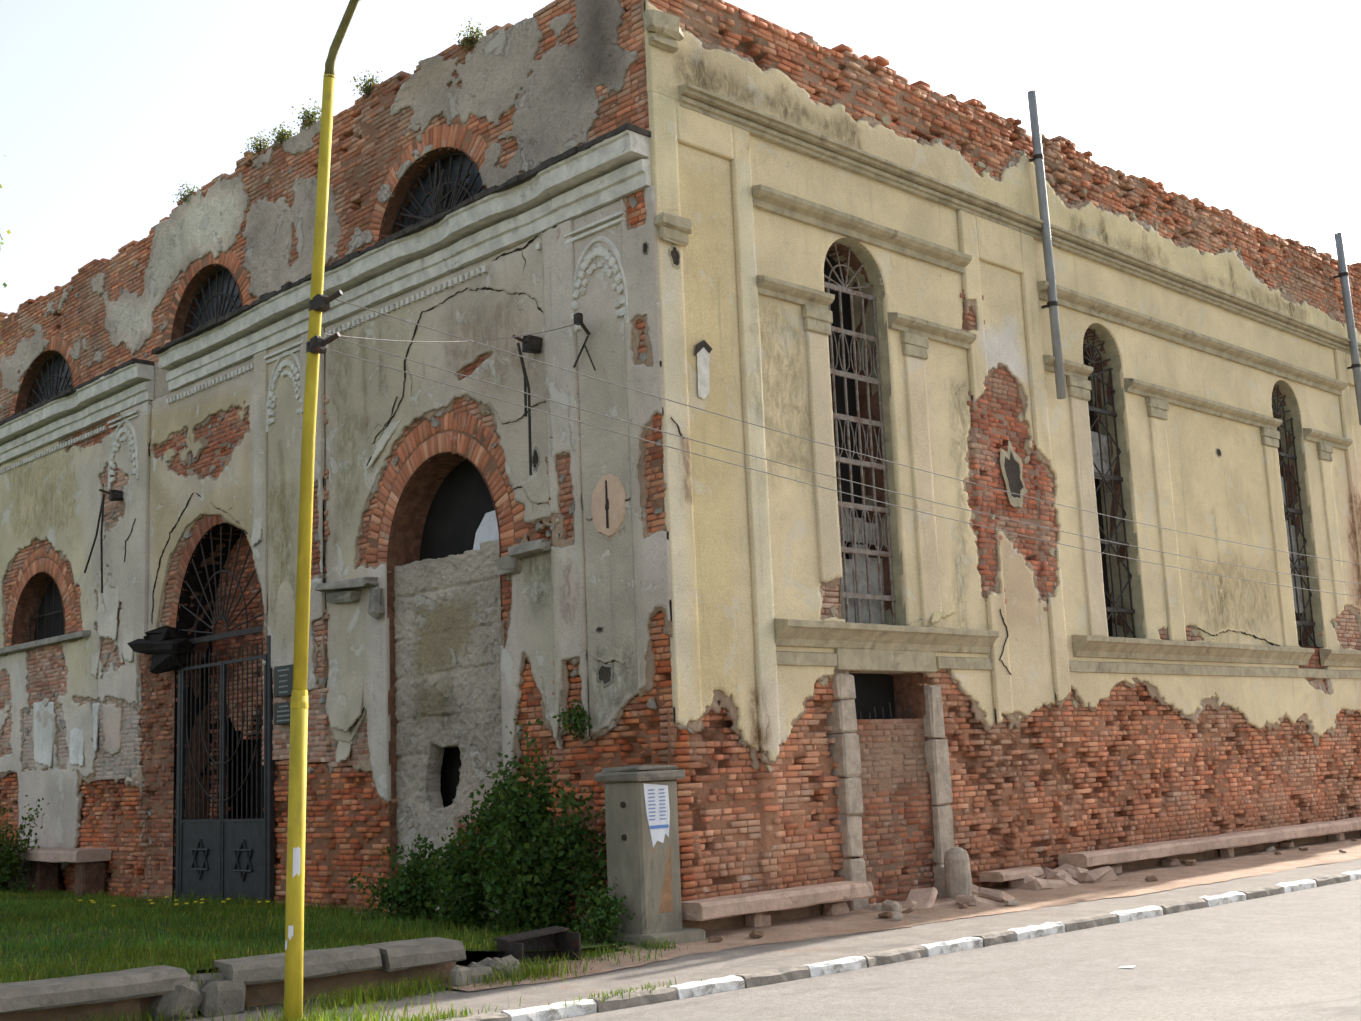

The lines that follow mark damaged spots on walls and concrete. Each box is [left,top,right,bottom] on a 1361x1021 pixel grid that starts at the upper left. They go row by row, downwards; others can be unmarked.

spalling [149,407,250,478]
spalling [0,0,578,421]
crack [366,224,559,466]
spalling [642,414,667,533]
peeling [694,340,712,399]
spalling [579,0,1361,333]
spalling [966,366,1059,611]
spalling [0,538,189,901]
spalling [260,585,291,907]
spalling [304,609,399,915]
spalling [513,610,852,927]
spalling [917,670,1361,888]